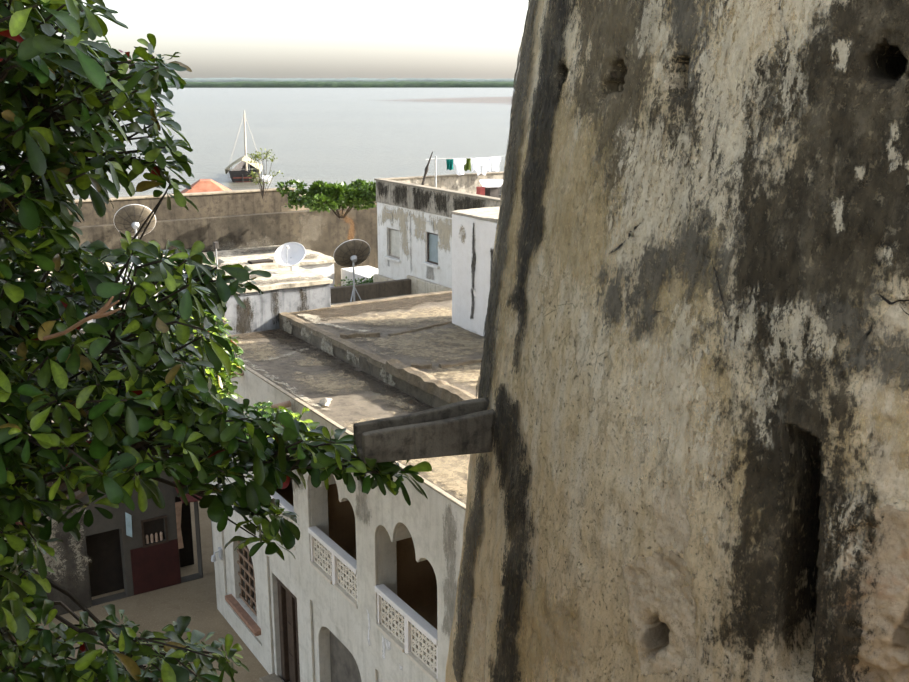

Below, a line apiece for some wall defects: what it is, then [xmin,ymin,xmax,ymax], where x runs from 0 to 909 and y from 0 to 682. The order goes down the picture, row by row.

water stain [270,291,281,325]
water stain [231,297,414,414]
water stain [338,0,909,682]
peeling [812,317,836,356]
crack [878,294,909,315]
spalling [816,297,909,682]